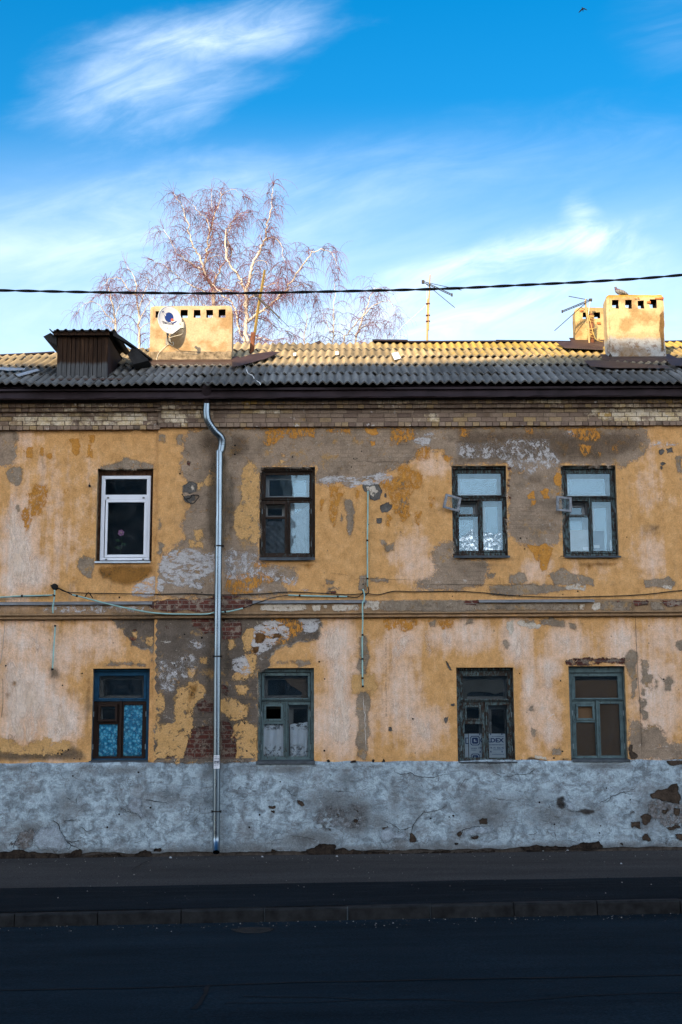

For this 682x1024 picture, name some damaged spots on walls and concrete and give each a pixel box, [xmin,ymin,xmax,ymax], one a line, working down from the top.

flaking render [0,431,25,486]
flaking render [100,426,682,766]
spalling [630,783,682,844]